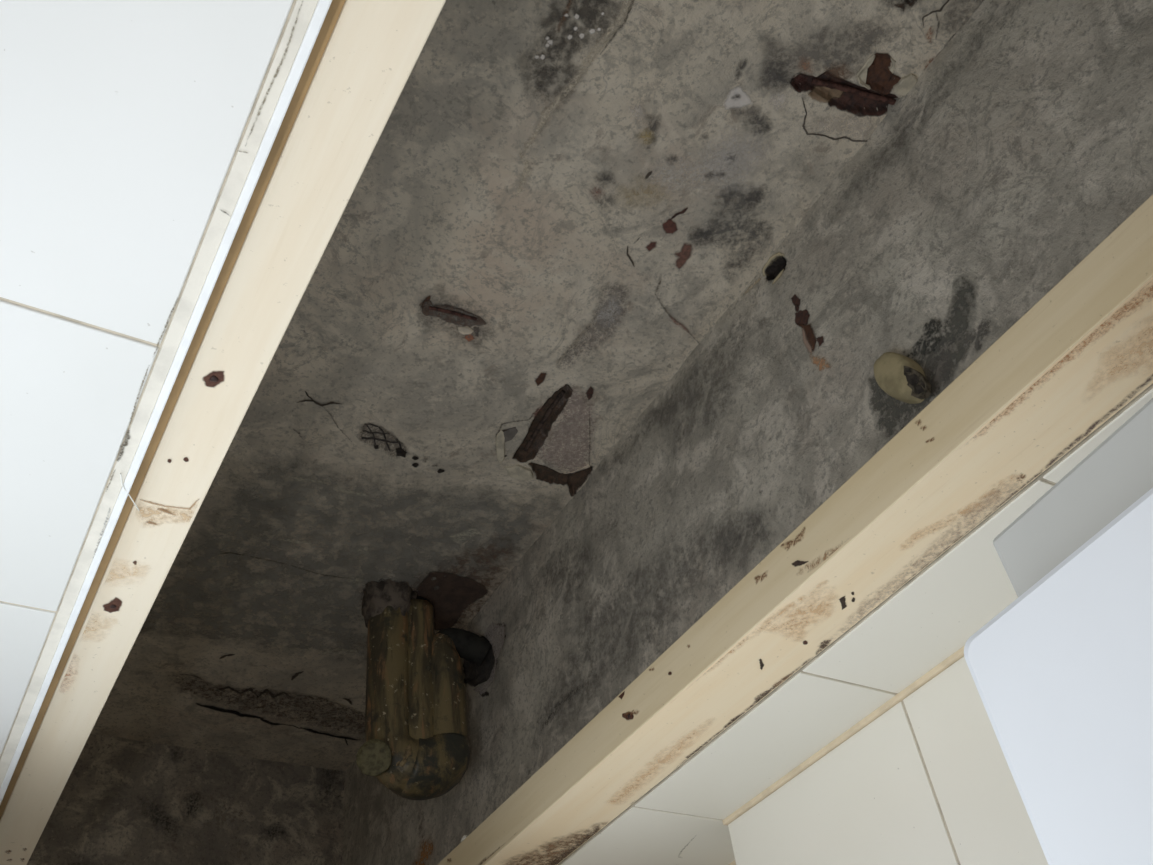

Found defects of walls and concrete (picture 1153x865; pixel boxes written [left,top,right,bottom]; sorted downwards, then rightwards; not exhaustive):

leakage [527,0,614,97]
crack [922,0,984,39]
spalling [790,53,918,117]
spalling [420,296,486,344]
rust [203,371,224,387]
leakage [869,277,989,443]
spalling [360,423,445,473]
spalling [496,384,594,496]
leakage [941,378,1152,551]
crack [196,703,360,745]
leakage [686,640,831,758]
leakage [508,826,599,865]